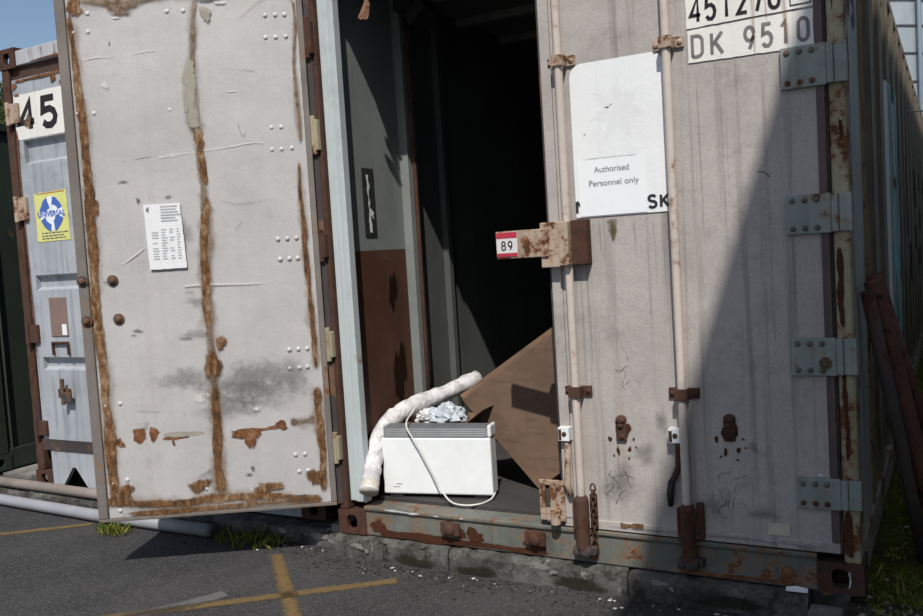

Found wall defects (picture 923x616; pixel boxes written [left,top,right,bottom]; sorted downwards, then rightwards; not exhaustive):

rust [11,70,61,97]
peeling [182,60,200,128]
rust [16,114,30,197]
rust [65,0,327,515]
rust [836,247,845,327]
rust [715,423,747,461]
rust [841,374,851,461]
rust [370,519,548,556]
rust [844,511,854,558]
rust [680,566,801,585]